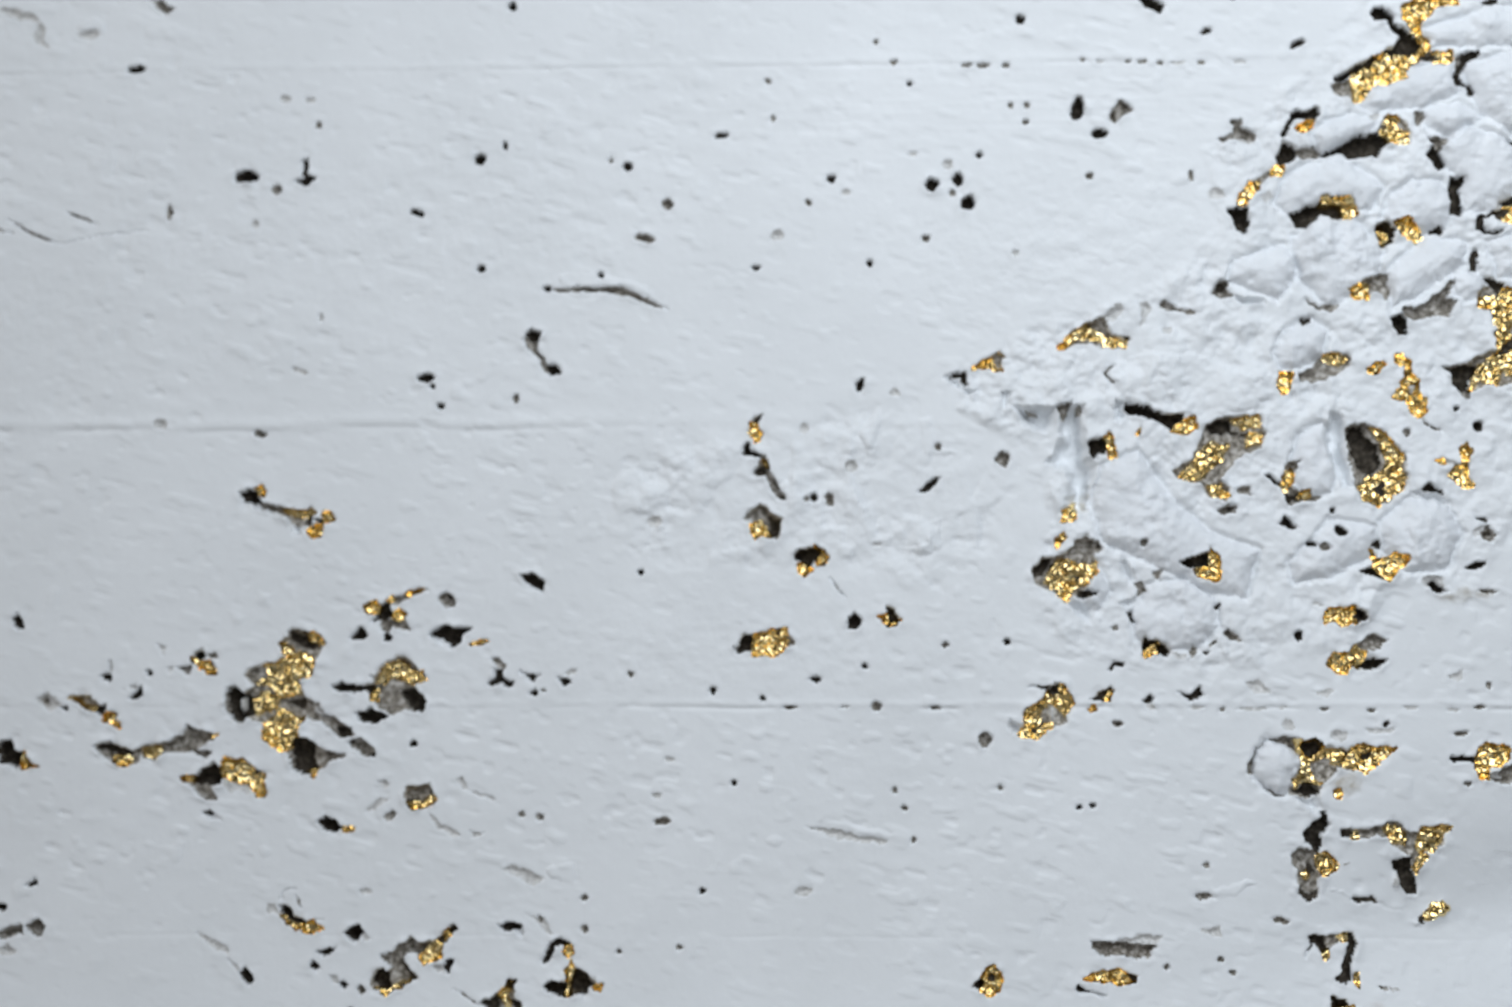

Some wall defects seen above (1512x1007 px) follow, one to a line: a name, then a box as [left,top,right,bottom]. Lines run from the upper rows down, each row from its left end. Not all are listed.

spalling [1070,97,1133,139]
spalling [924,160,975,210]
flaking render [1212,5,1512,384]
spalling [1000,390,1082,435]
flaking render [1031,300,1276,660]
flaking render [1279,423,1496,587]
peeling [95,725,212,765]
peeling [225,667,375,769]
flaking render [1191,679,1355,799]
peeling [1489,764,1512,784]
spalling [0,904,46,956]
peeling [370,936,432,987]